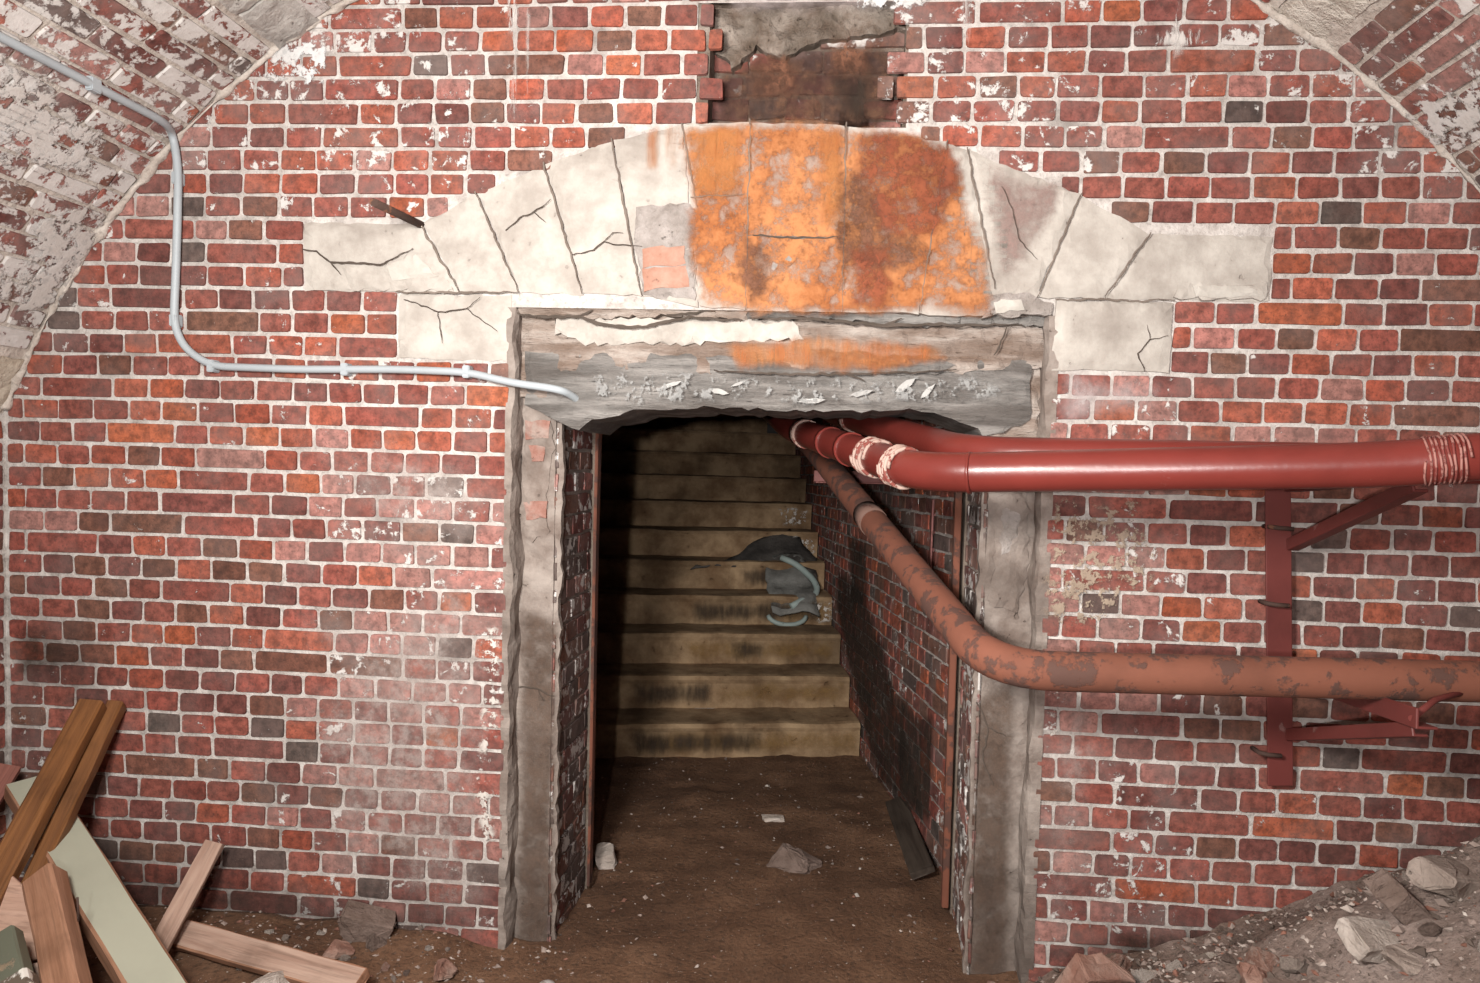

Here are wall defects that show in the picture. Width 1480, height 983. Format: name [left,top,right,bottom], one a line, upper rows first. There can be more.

leakage [719,42,889,124]
peeling [1406,77,1480,145]
peeling [0,269,14,300]
crack [303,248,413,275]
crack [572,232,642,255]
rust [685,123,988,314]
rust [992,182,1055,257]
crack [404,297,1022,355]
peeling [595,373,999,404]
rust [734,340,930,370]
crack [714,369,956,382]
spalling [1005,379,1040,437]